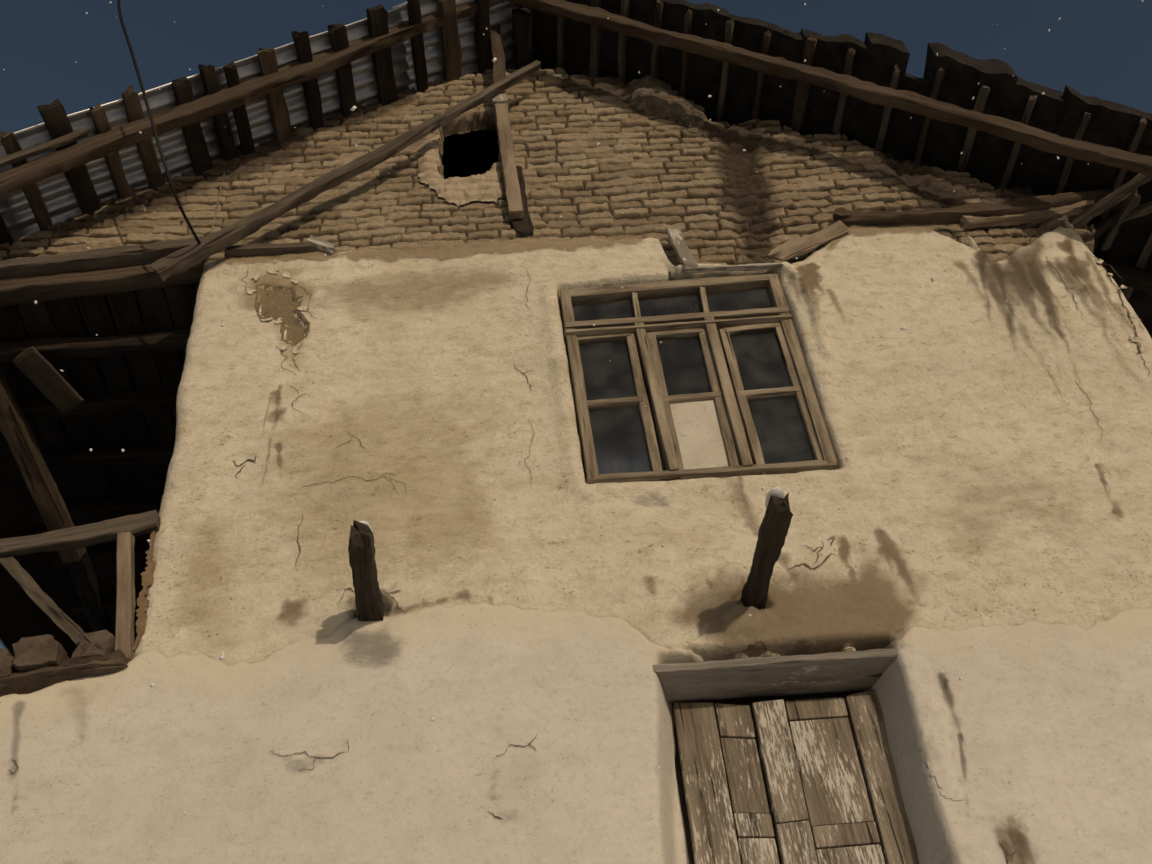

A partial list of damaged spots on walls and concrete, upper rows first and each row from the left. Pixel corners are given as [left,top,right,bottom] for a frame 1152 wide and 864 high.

spalling [246,268,310,354]
leakage [796,263,821,303]
leakage [978,242,1063,336]
leakage [1059,241,1106,294]
crack [1090,254,1150,376]
crack [296,472,406,562]
leakage [683,530,912,657]
crack [788,537,835,570]
crack [271,741,349,771]